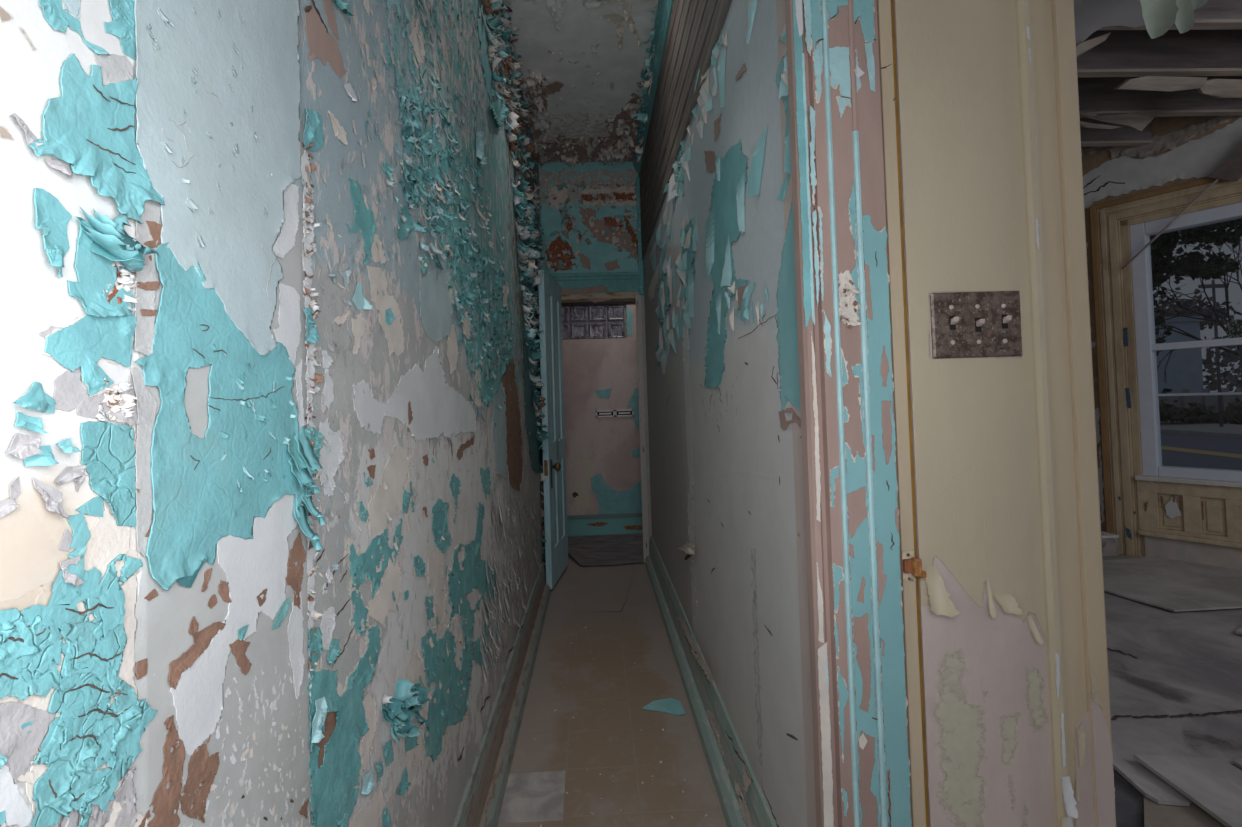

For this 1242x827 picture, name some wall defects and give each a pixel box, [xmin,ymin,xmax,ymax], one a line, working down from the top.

peeling [0,0,912,827]